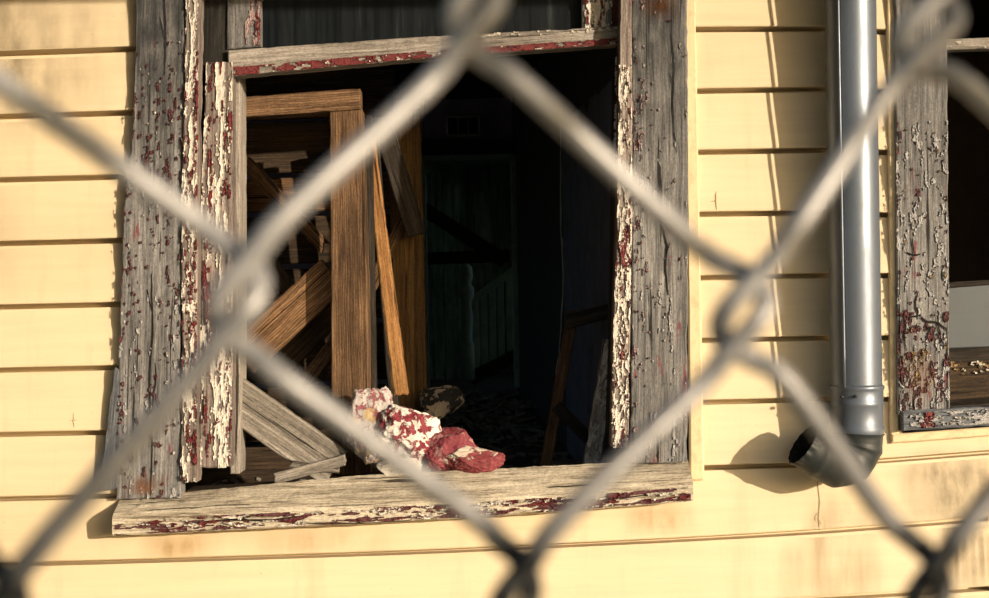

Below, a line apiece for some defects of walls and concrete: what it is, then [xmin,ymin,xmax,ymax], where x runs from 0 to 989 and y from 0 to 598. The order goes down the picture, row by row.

peeling [131,0,439,231]
peeling [613,38,677,192]
peeling [117,186,229,435]
peeling [584,190,674,464]
crack [898,294,947,354]
peeling [896,121,989,428]
peeling [124,356,232,499]
peeling [115,504,457,535]
peeling [478,497,566,515]
peeling [591,487,691,509]